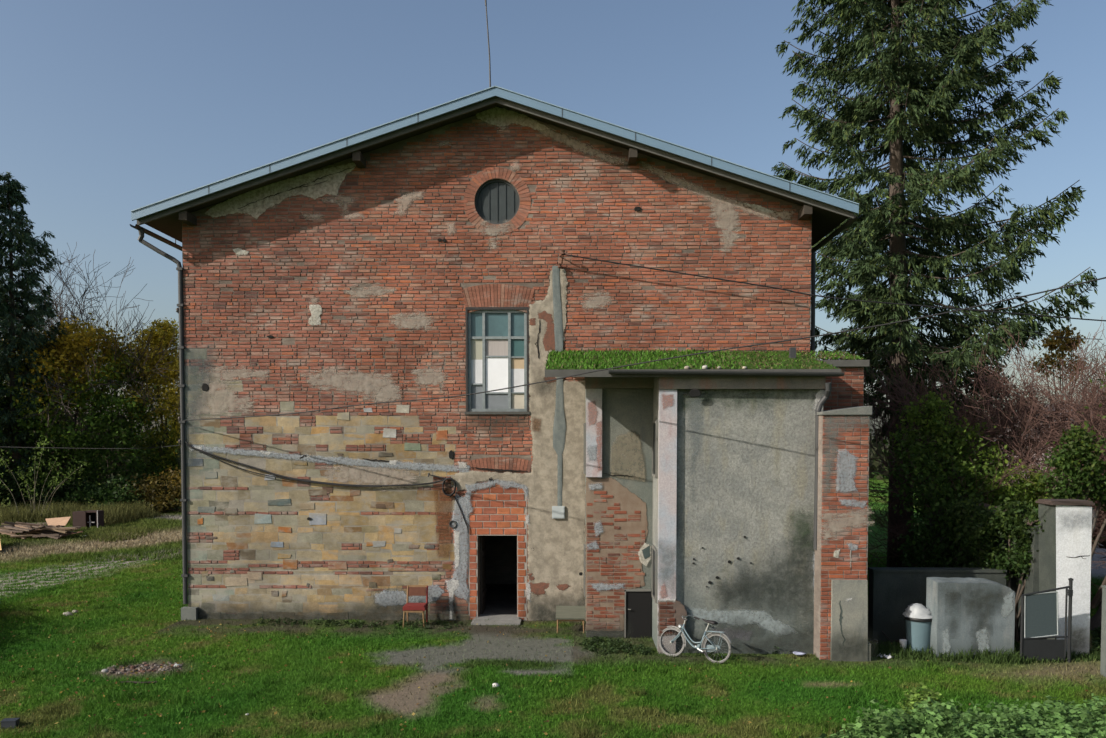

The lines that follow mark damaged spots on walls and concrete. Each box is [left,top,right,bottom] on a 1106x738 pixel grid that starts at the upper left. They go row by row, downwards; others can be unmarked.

flaking render [540,129,626,163]
flaking render [205,162,363,219]
flaking render [640,161,794,220]
spalling [529,311,555,351]
peeling [446,531,460,620]
leakage [727,509,874,610]